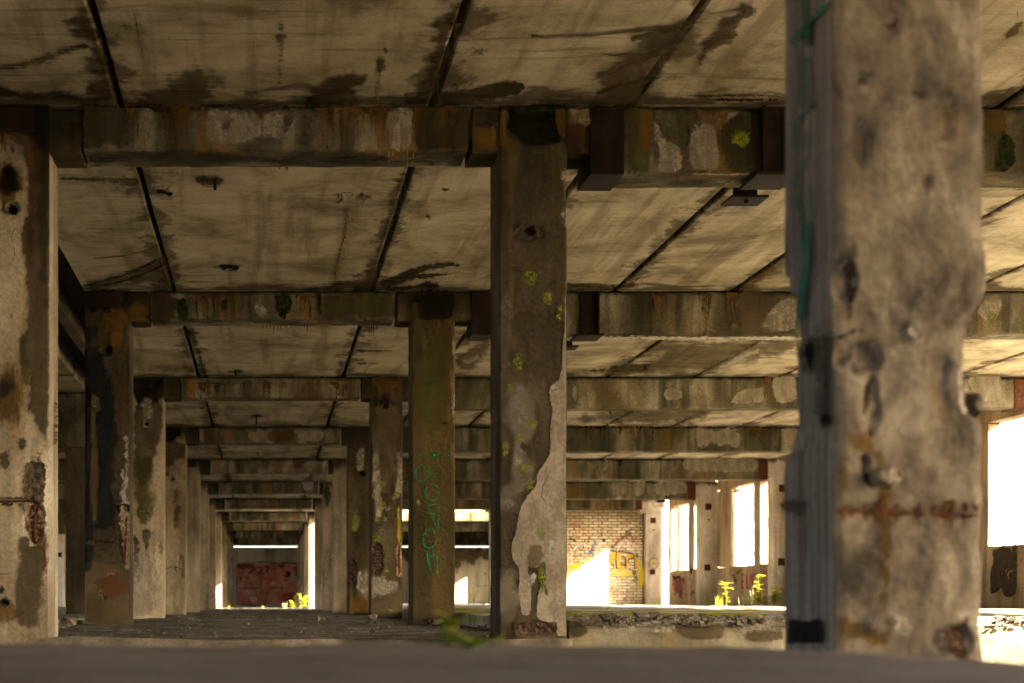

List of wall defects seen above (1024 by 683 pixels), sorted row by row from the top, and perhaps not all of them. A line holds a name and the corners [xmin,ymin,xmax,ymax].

damp [392,0,706,154]
peeling [653,122,718,173]
damp [0,10,390,437]
spalling [0,461,47,566]
damp [90,410,99,522]
damp [85,534,147,624]
rust [514,621,556,636]
peeling [511,300,578,636]
rust [836,484,979,645]